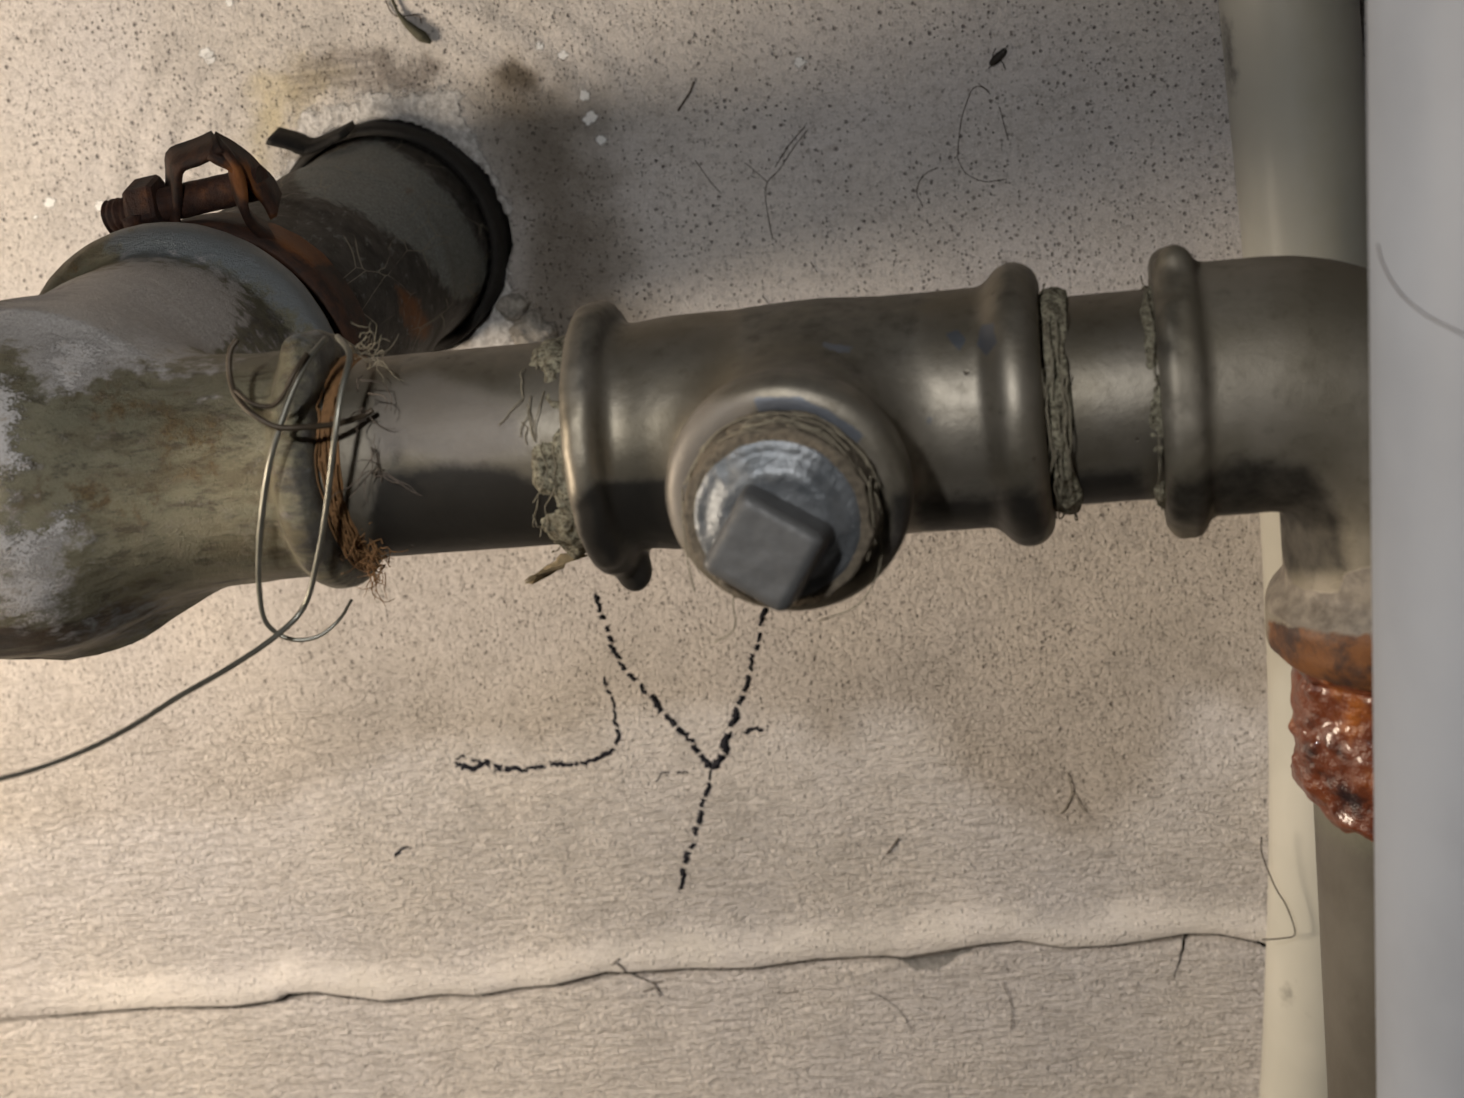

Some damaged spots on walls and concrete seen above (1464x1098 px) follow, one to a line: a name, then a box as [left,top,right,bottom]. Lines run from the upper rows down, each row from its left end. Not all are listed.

crack [49,956,905,1017]
crack [941,934,1266,979]